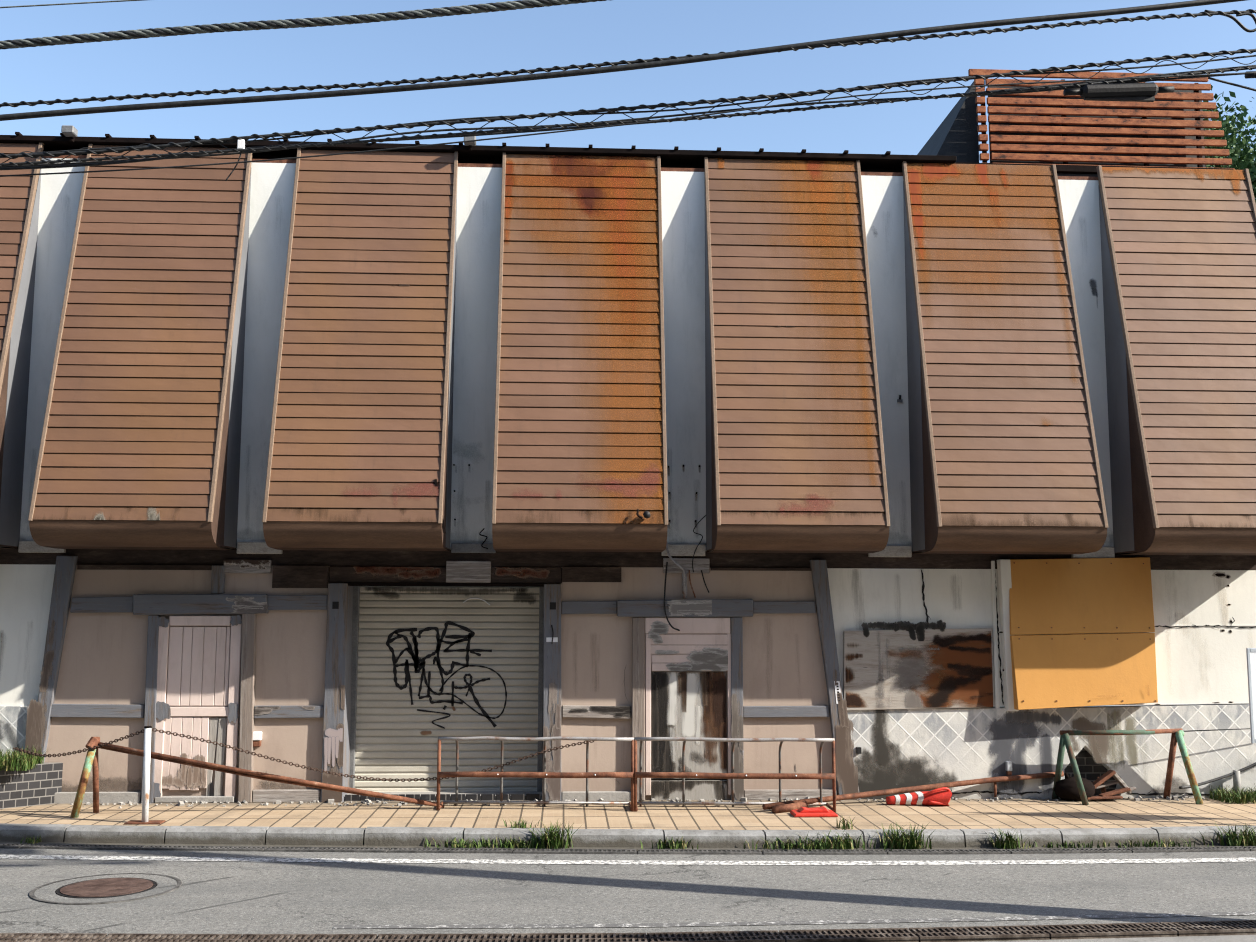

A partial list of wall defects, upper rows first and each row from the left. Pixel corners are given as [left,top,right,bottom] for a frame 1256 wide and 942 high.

corrosion [505,155,684,524]
corrosion [776,160,864,363]
corrosion [906,163,1060,281]